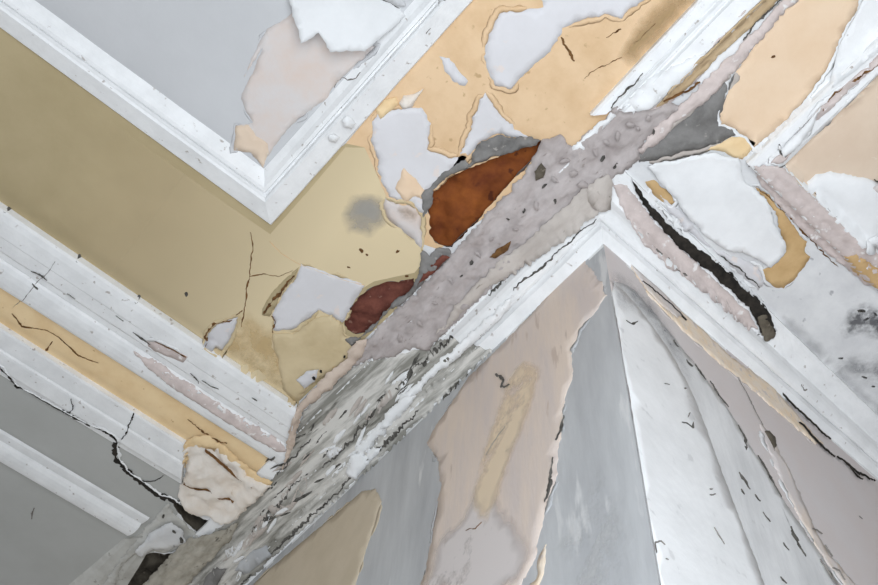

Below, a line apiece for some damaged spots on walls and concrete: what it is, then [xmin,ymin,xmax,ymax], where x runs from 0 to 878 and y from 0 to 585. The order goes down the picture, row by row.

peeling [229,0,406,168]
crack [222,232,363,327]
spalling [353,0,878,366]
crack [632,181,777,342]
leakage [849,312,878,331]
crack [0,365,180,505]
peeling [104,247,607,585]
peeling [610,264,856,585]
crack [783,393,876,481]